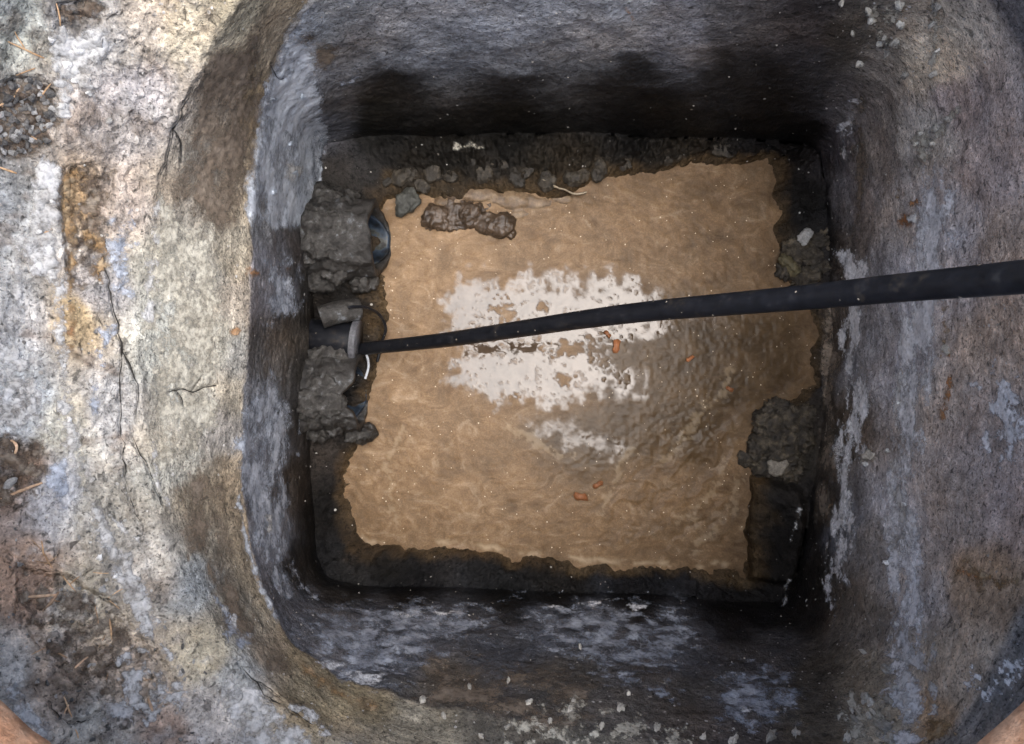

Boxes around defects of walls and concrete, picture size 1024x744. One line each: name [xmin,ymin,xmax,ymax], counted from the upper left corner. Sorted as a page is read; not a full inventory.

leakage [296,36,339,71]
crack [160,75,202,175]
leakage [262,254,303,324]
leakage [836,86,868,219]
leakage [837,235,868,280]
leakage [910,166,958,272]
crack [103,257,163,531]
leakage [234,370,699,729]
leakage [816,306,869,610]
leakage [880,299,946,744]